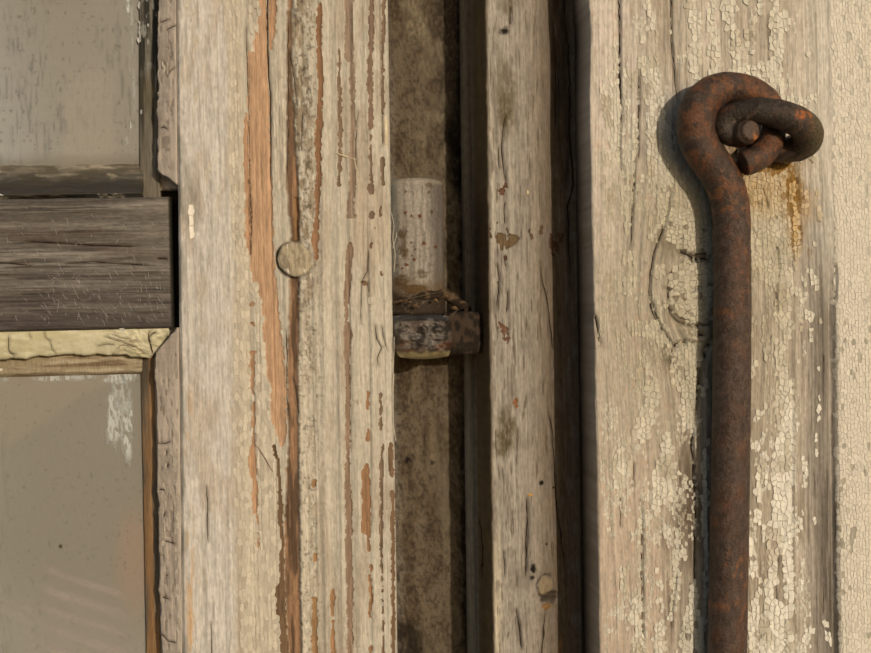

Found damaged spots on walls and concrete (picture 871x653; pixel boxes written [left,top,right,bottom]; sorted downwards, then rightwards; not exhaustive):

crack [98,332,155,353]
peeling [228,0,290,653]
peeling [311,2,324,260]
peeling [337,0,387,219]
peeling [330,242,396,653]
rust [396,230,437,293]
peeling [600,0,713,653]
peeling [683,0,819,106]
rust [758,162,802,243]
peeling [742,170,832,653]
peeling [310,597,318,653]